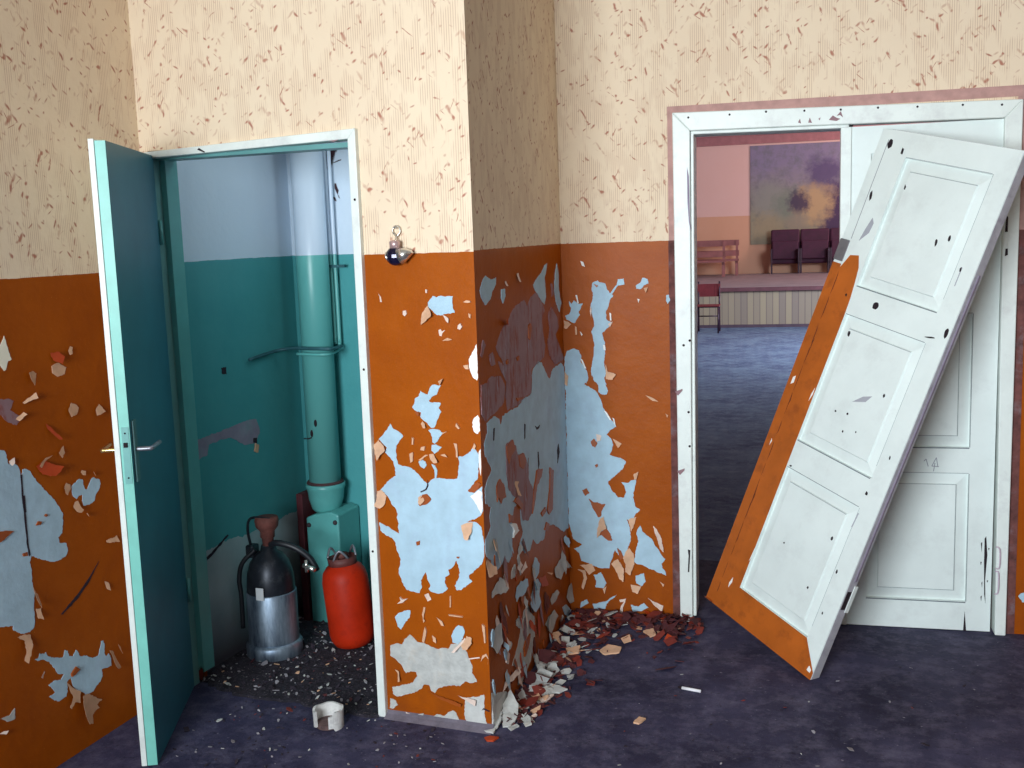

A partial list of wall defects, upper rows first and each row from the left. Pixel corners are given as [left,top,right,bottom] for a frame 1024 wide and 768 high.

peeling [0,337,12,371]
peeling [50,346,73,377]
peeling [0,371,38,425]
peeling [374,263,666,724]
peeling [0,424,122,724]
peeling [0,708,15,734]